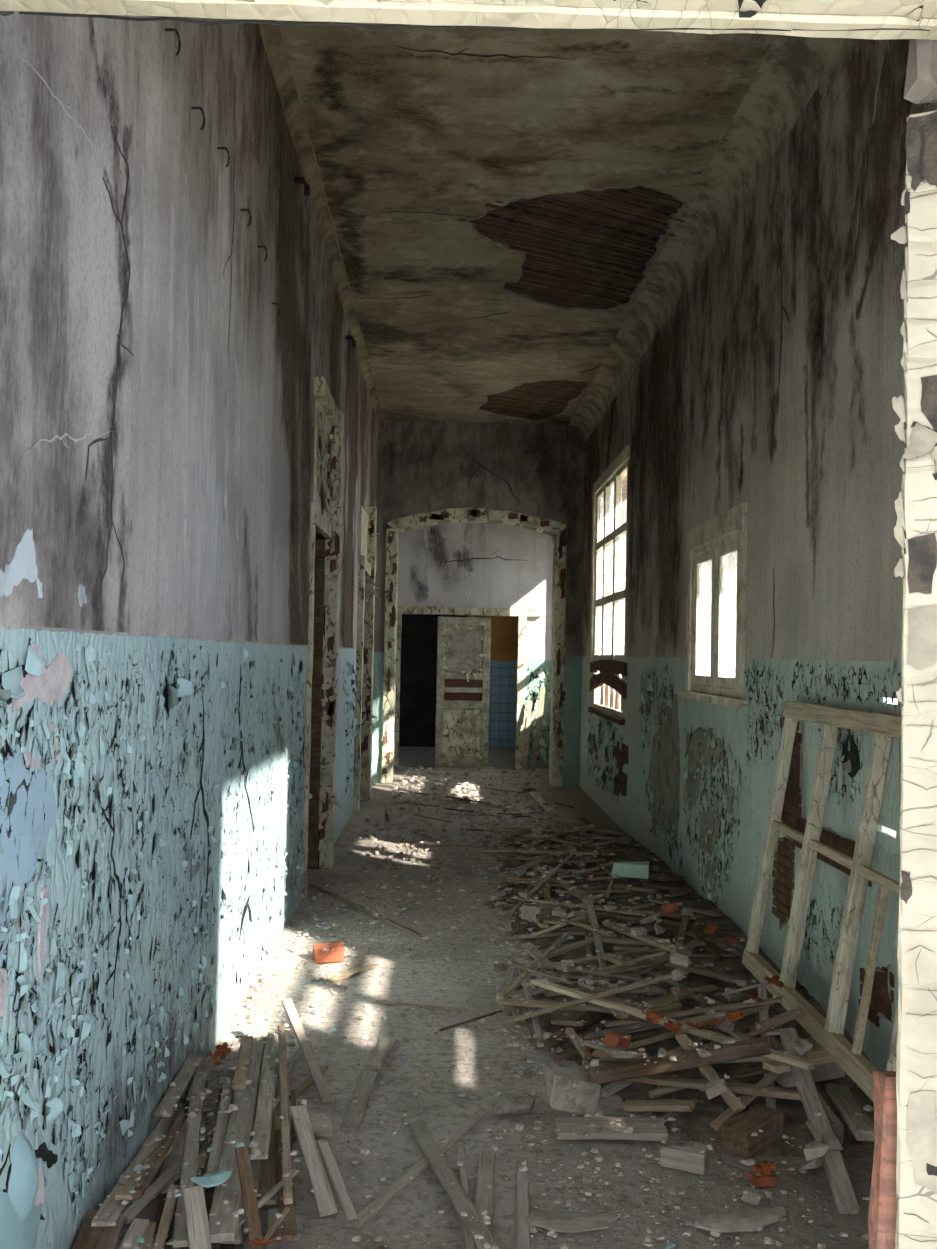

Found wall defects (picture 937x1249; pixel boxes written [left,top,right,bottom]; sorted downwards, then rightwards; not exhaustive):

water stain [0,275,21,561]
peeling [0,527,43,598]
crack [16,50,134,625]
water stain [31,59,132,632]
water stain [183,269,257,641]
water stain [253,19,314,645]
crack [19,11,930,254]
peeling [738,0,766,18]
peeling [586,375,937,931]
water stain [777,39,910,444]
peeling [891,184,910,247]
peeling [0,627,390,1222]